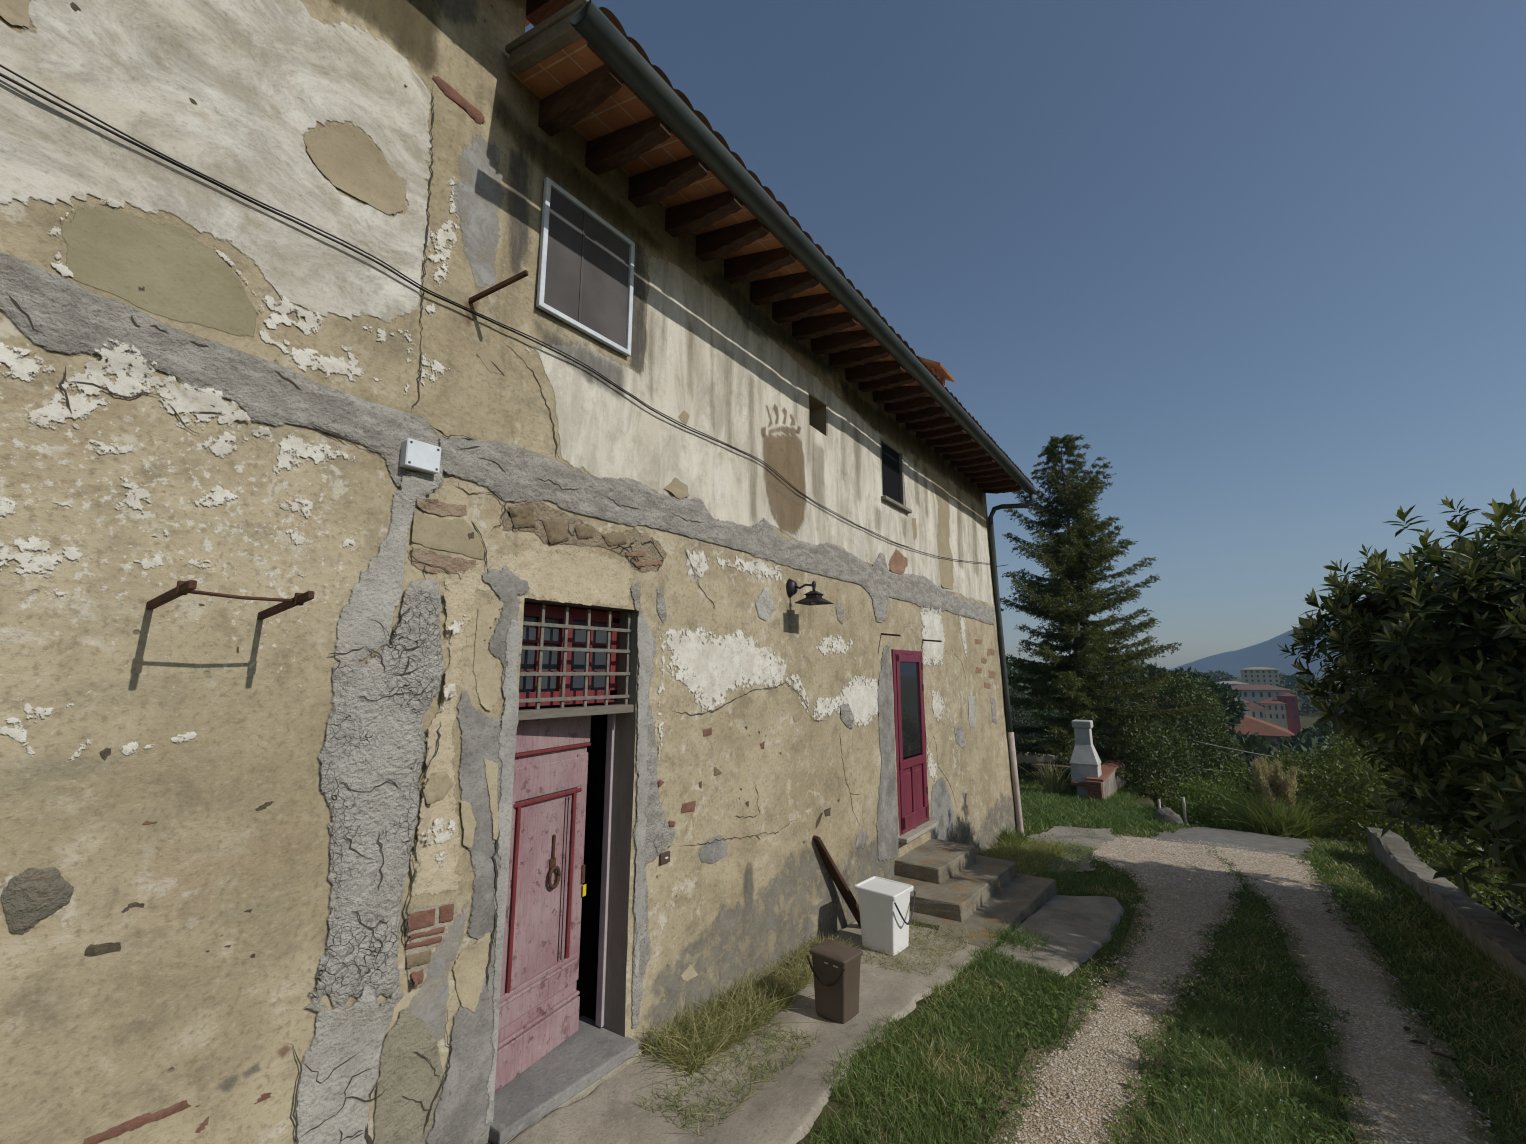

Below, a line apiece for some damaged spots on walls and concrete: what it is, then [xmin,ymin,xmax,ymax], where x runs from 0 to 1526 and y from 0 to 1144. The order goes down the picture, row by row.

peeling [0,0,485,394]
crack [58,366,226,435]
peeling [0,338,356,475]
crack [275,370,383,453]
crack [411,88,715,608]
peeling [525,255,995,689]
crack [329,607,441,792]
flaking render [405,498,667,988]
peeling [658,627,879,759]
crack [289,834,453,1144]
flaking render [373,1009,445,1144]
crack [486,830,500,991]